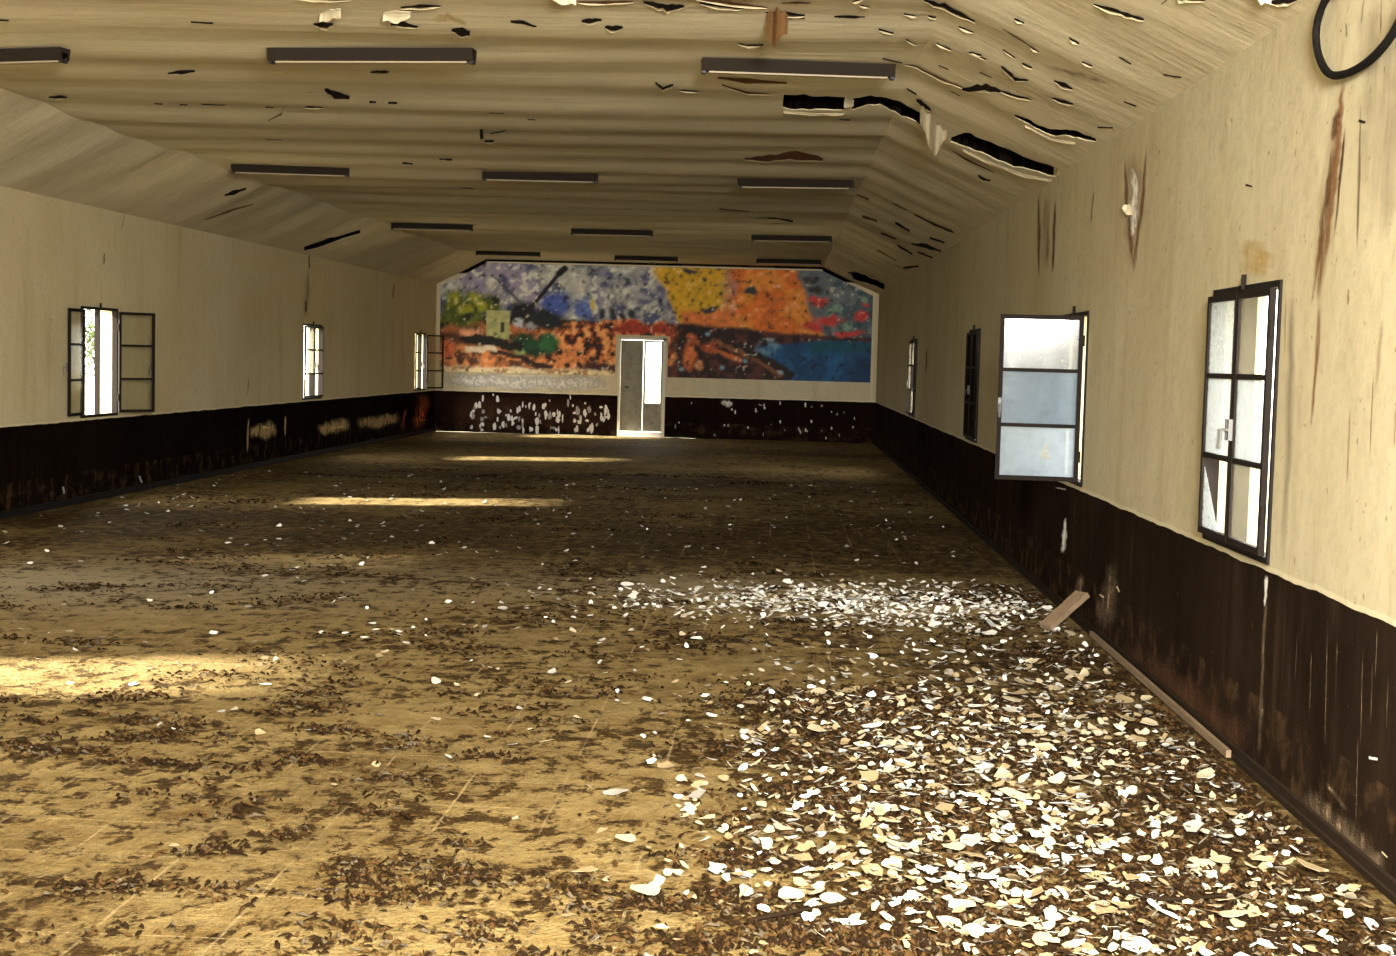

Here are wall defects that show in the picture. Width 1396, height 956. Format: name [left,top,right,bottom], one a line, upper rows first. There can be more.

peeling [300,0,352,30]
peeling [383,4,470,38]
peeling [553,0,811,47]
peeling [969,18,1039,83]
peeling [1052,37,1096,106]
spalling [1015,115,1096,141]
spalling [951,133,1058,176]
peeling [450,374,610,434]